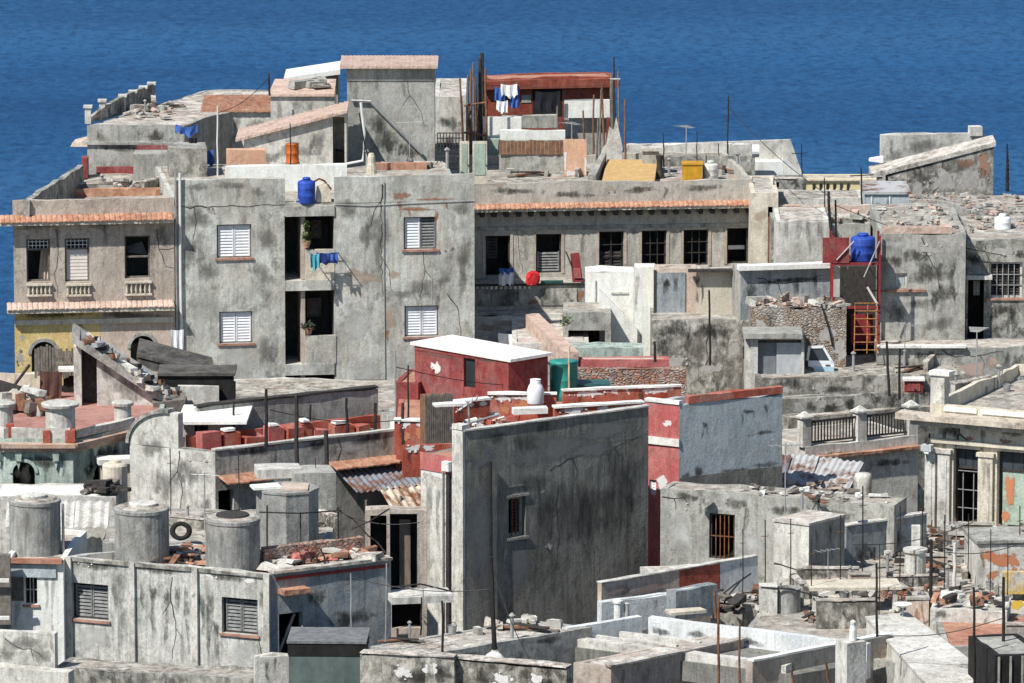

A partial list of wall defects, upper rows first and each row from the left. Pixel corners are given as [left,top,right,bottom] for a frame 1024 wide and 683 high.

flaking render [908,151,992,194]
leakage [887,251,956,305]
peeling [1002,476,1015,523]
peeling [982,550,1024,580]
crack [163,577,183,659]
flaking render [394,663,437,680]
flaking render [493,671,513,683]